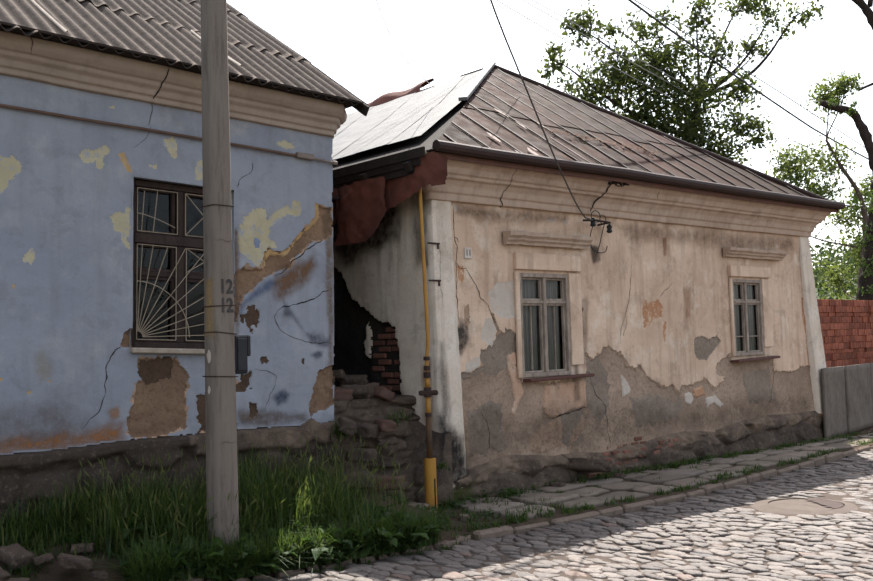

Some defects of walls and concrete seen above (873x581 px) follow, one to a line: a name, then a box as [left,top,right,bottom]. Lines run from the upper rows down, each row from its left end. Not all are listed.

crack [135,67,170,147]
peeling [79,145,132,172]
peeling [109,207,131,249]
flaking render [233,200,333,334]
crack [437,203,496,323]
crack [81,347,121,430]
flaking render [125,355,206,439]
flaking render [236,371,252,392]
flaking render [249,402,258,418]
crack [274,287,333,344]
flaking render [309,267,402,417]
flaking render [461,298,815,478]